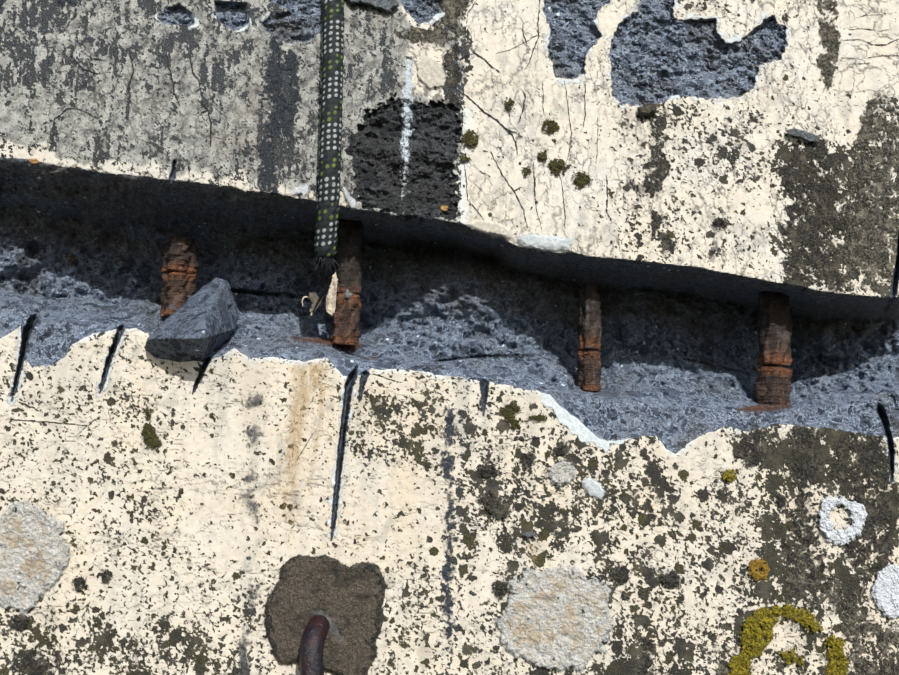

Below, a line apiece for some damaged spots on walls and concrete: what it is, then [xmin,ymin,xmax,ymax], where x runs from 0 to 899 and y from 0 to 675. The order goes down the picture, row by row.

peeling [416,56,446,88]
spalling [540,0,791,109]
spalling [343,93,464,224]
peeling [290,184,309,200]
spalling [0,303,75,367]
spalling [541,389,899,454]